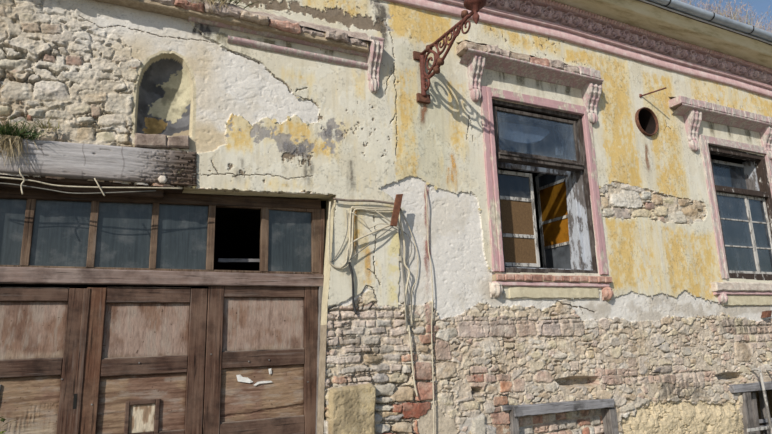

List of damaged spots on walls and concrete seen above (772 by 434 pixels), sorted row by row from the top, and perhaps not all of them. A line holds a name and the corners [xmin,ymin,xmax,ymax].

crack [79,15,320,120]
flaking render [40,0,379,168]
peeling [298,0,465,46]
crack [385,29,398,156]
crack [197,160,313,179]
flaking render [323,22,772,434]